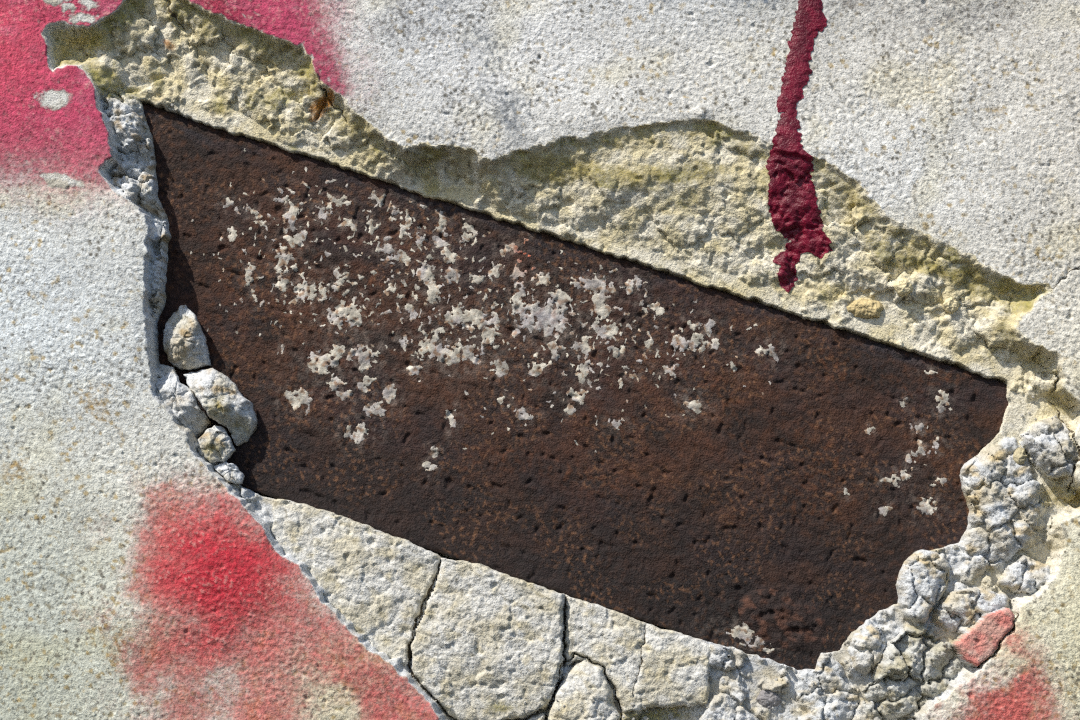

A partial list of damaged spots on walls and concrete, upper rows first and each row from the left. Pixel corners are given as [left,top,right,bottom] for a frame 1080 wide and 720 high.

peeling [34,89,71,110]
peeling [220,179,720,422]
peeling [344,384,397,444]
peeling [497,389,534,431]
peeling [935,390,952,413]
peeling [422,446,439,471]
peeling [880,423,939,488]
peeling [916,477,947,515]
crack [407,557,455,720]
crack [516,596,646,720]
peeling [726,623,774,654]
corrosion [738,588,828,651]